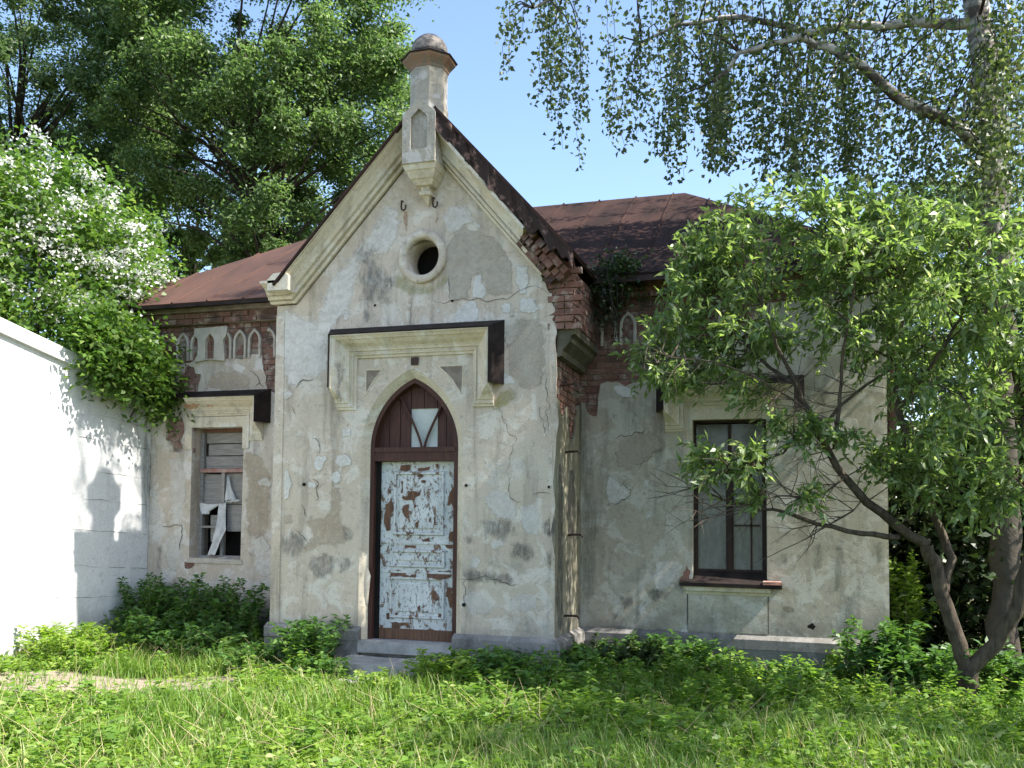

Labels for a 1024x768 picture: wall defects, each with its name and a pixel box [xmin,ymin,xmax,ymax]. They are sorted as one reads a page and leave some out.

peeling [146,205,401,399]
crack [435,278,544,304]
peeling [443,206,726,442]
flaking render [165,416,196,453]
peeling [245,453,271,591]
peeling [304,454,352,550]
peeling [384,464,439,548]
crack [499,409,549,503]
crack [607,430,657,506]
peeling [380,612,410,640]
peeling [390,570,452,617]
crack [458,576,516,603]